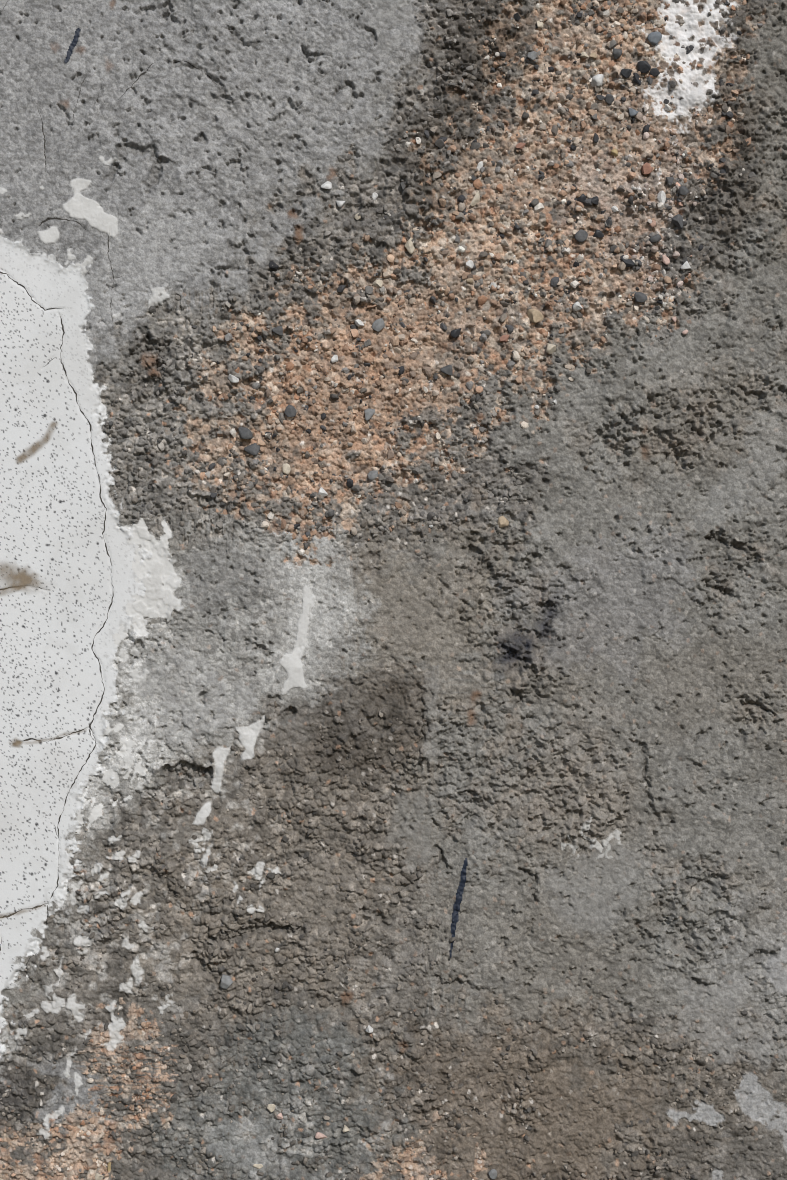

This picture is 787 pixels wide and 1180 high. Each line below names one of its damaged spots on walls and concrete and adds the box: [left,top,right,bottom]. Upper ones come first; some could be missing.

peeling [63,178,118,237]
peeling [37,227,93,275]
crack [39,217,122,323]
spalling [93,0,778,694]
crack [0,271,114,951]
peeling [189,716,266,873]
peeling [562,818,622,859]
peeling [233,882,265,914]
peeling [248,862,281,888]
spalling [358,1112,459,1180]
flaking render [667,1100,725,1127]
flaking render [734,1072,787,1152]